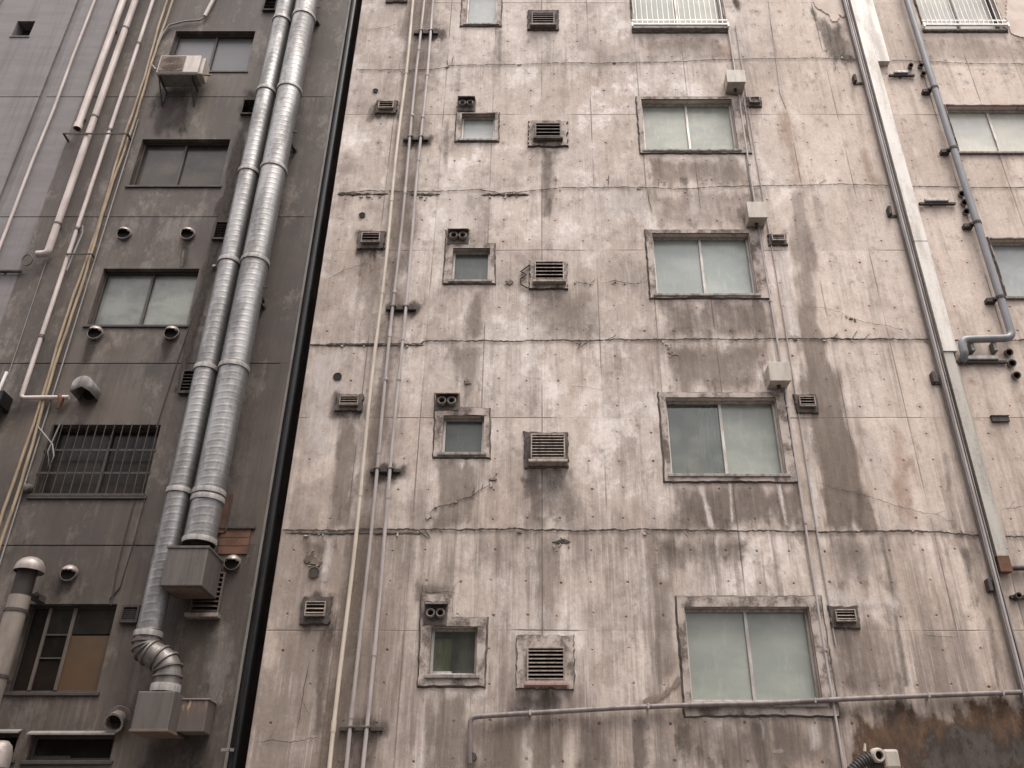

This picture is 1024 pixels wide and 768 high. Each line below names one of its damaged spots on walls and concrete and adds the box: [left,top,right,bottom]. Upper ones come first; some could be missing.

water stain [543,151,552,203]
water stain [662,251,877,546]
crack [282,472,1024,543]
rust [853,696,1024,768]